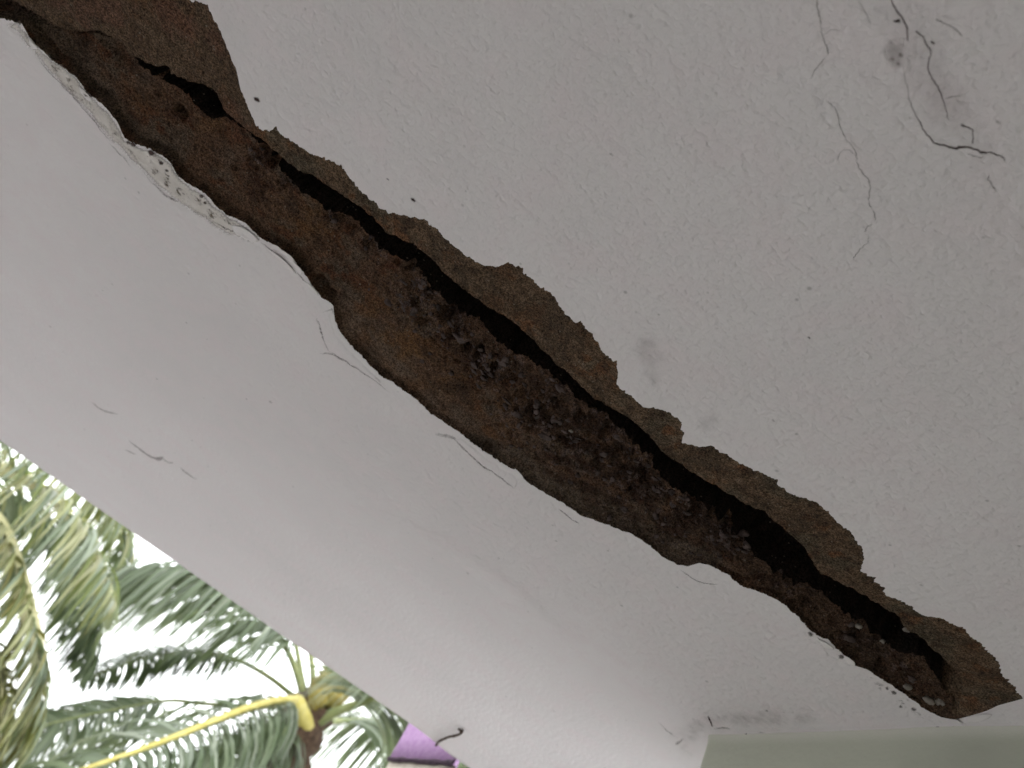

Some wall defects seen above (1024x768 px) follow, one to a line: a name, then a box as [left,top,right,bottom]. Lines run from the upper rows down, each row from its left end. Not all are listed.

peeling [11,24,258,242]
spalling [279,157,963,719]